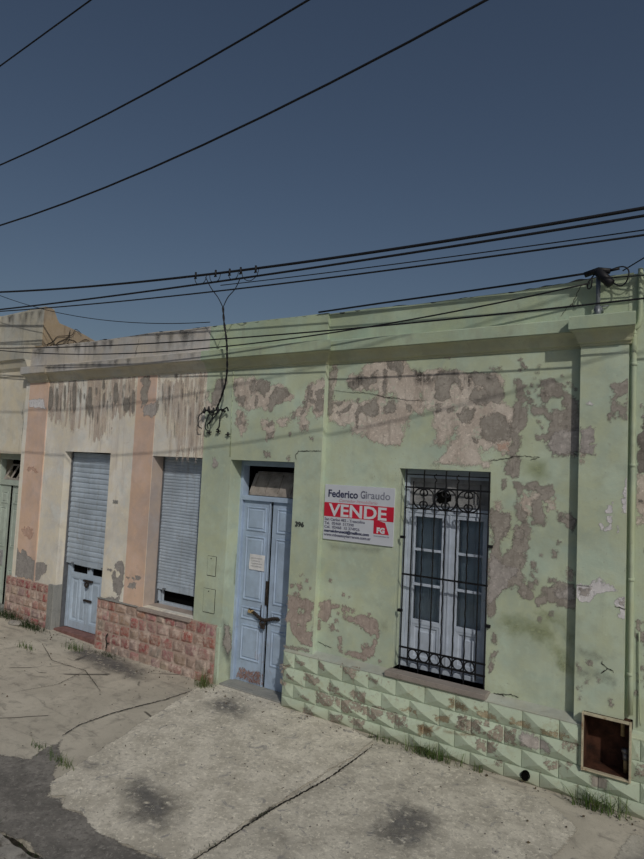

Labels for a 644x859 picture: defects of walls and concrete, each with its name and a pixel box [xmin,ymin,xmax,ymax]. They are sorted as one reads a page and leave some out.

peeling [29,357,644,642]
peeling [15,548,47,581]
peeling [236,667,263,685]
peeling [280,574,578,770]
crack [194,747,371,859]